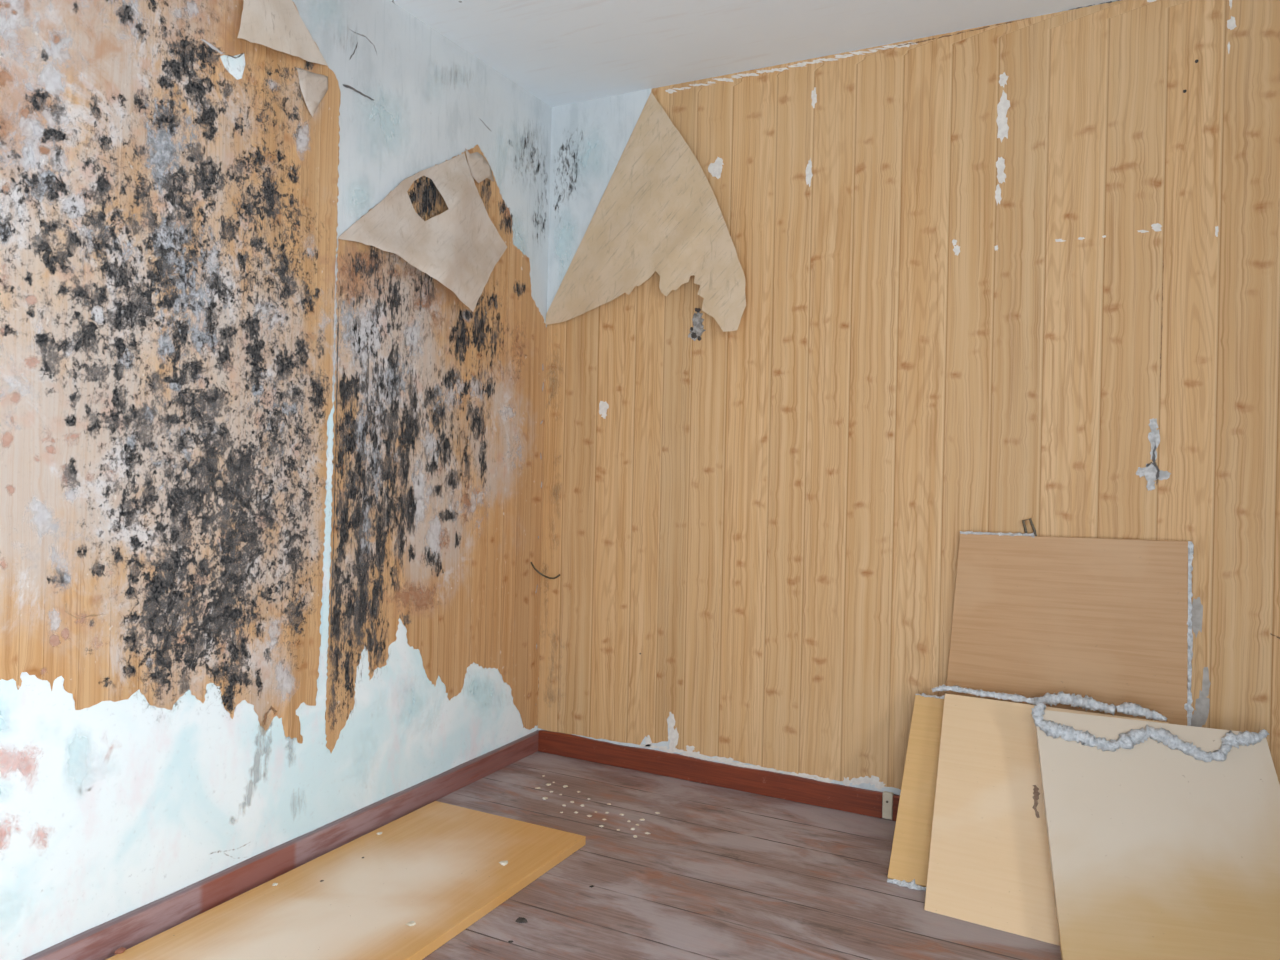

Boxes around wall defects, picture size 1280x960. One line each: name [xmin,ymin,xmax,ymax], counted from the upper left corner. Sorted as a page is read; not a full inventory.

damp [0,0,522,823]
flaking render [0,399,537,960]
peeling [708,157,724,179]
peeling [995,72,1010,204]